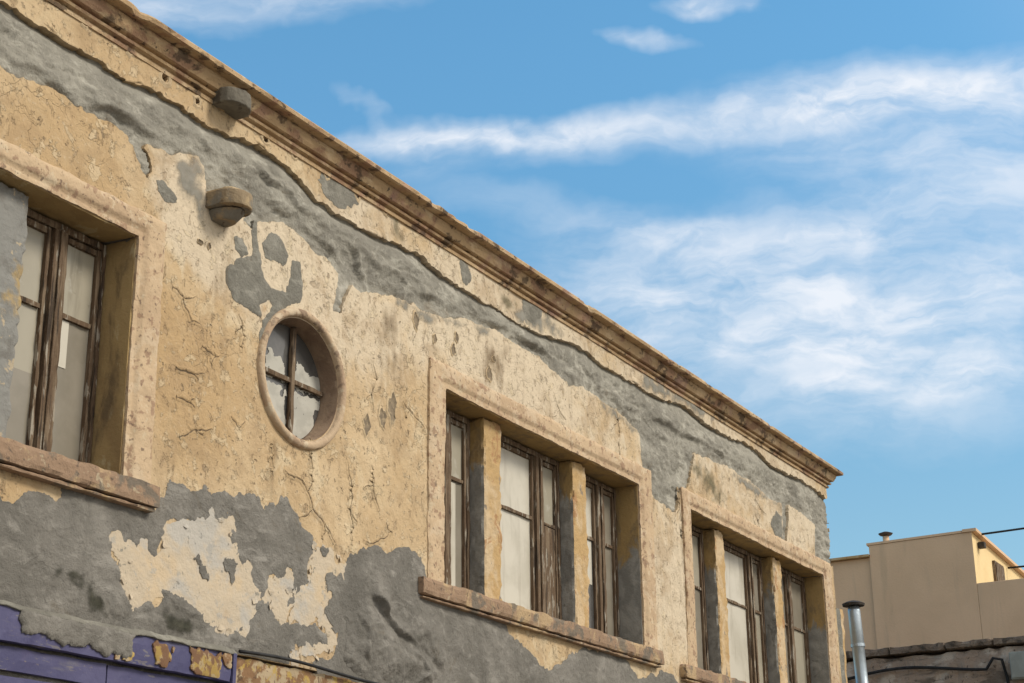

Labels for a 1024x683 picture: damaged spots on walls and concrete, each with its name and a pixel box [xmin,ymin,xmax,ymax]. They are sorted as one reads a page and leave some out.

spalling [0,3,830,563]
crack [172,284,247,440]
crack [364,360,378,413]
crack [267,438,393,549]
peeling [189,646,232,678]
peeling [109,507,348,668]